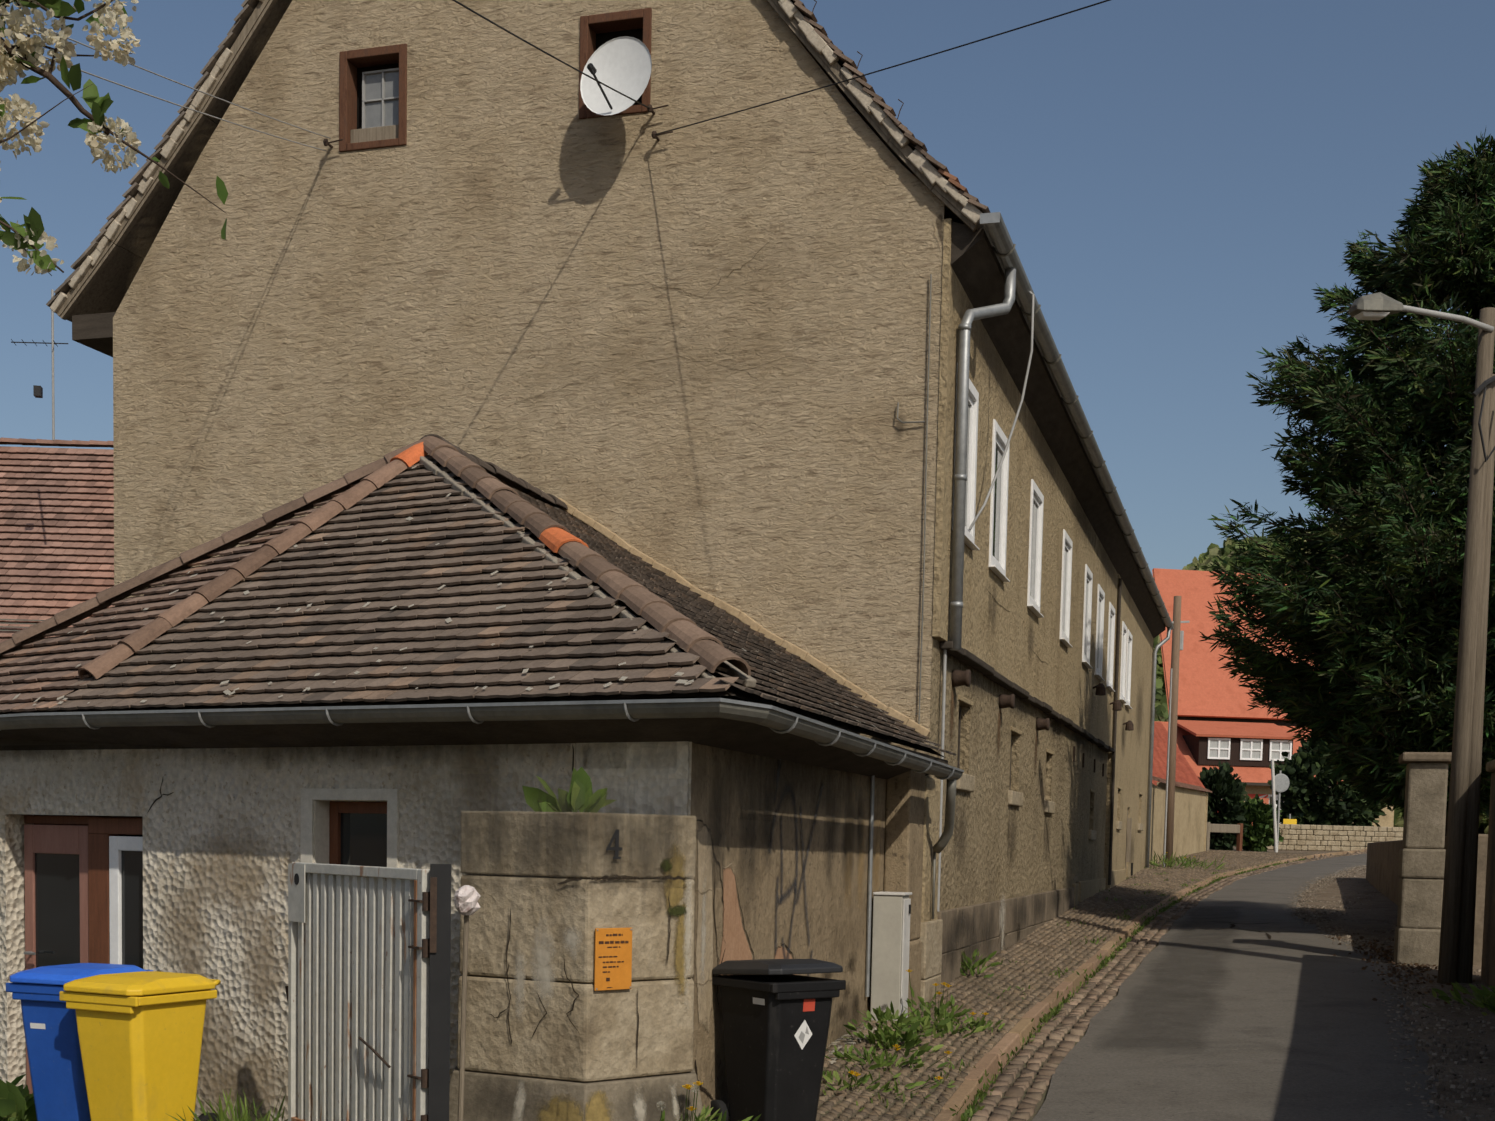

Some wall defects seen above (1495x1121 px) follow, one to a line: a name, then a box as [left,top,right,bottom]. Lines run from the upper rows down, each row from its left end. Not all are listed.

crack [489,908,580,1045]
crack [558,877,582,885]
spalling [591,826,754,1032]
crack [697,820,726,1005]